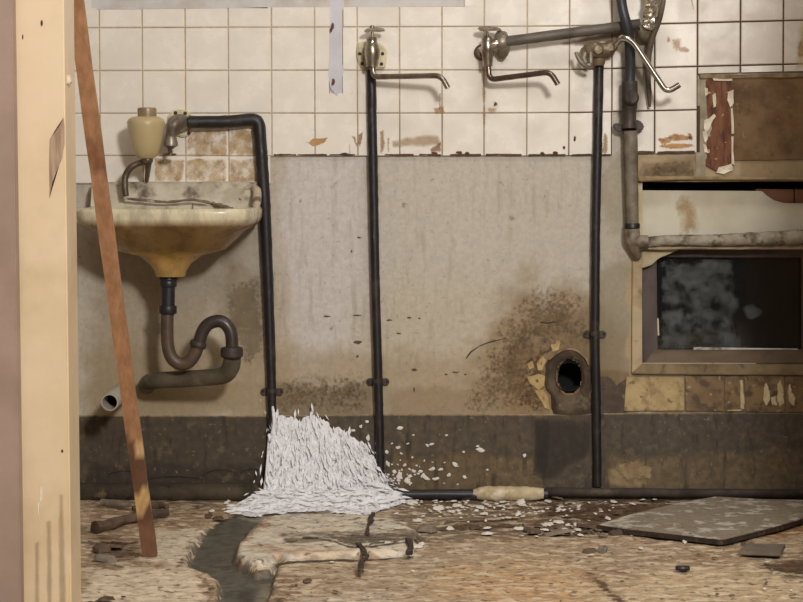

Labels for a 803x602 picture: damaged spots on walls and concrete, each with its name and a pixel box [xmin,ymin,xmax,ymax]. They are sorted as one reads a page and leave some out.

leakage [155,129,257,182]
corrosion [659,133,693,149]
peeling [638,77,735,174]
flaking render [754,189,803,203]
leakage [487,296,579,409]
spalling [527,340,592,416]
leakage [591,376,627,414]